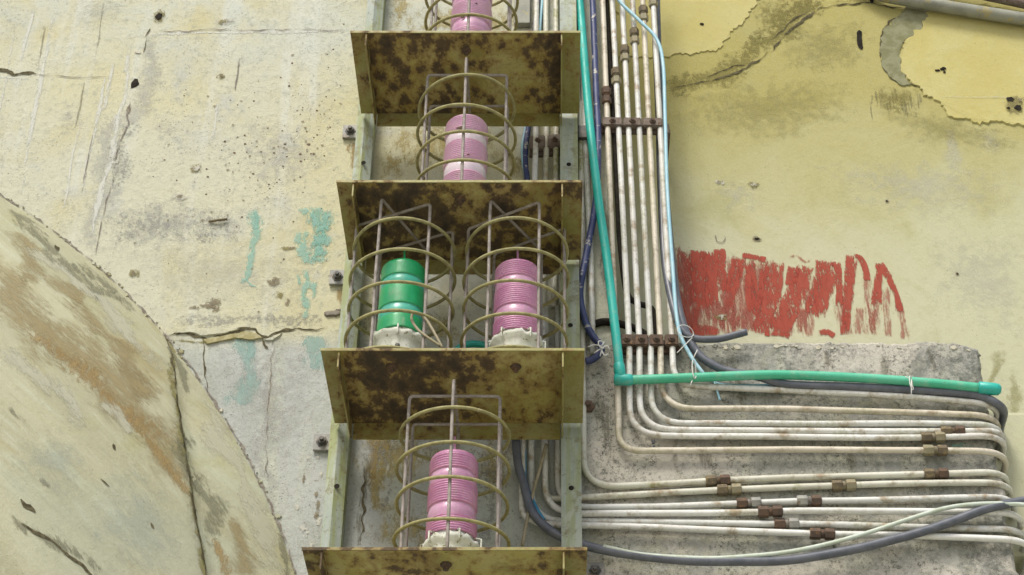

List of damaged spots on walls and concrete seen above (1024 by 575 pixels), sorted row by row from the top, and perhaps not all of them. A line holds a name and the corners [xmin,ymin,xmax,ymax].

crack [667,0,922,96]
peeling [899,11,1024,127]
crack [0,28,343,249]
crack [165,327,328,575]
crack [13,518,100,575]